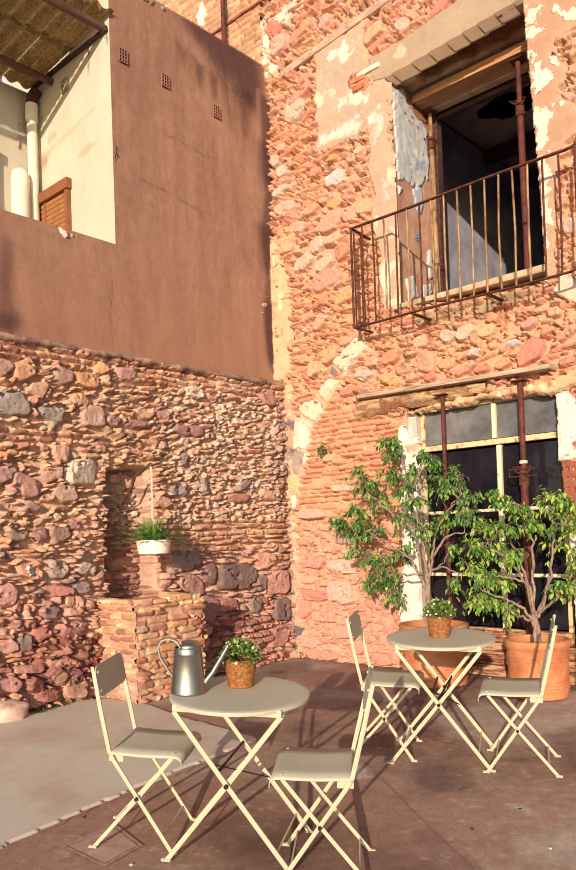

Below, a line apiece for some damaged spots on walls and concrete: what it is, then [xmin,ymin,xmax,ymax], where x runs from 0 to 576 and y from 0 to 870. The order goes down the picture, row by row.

leakage [188,19,258,105]
flaking render [313,18,433,309]
flaking render [522,0,576,287]
peeling [556,389,576,462]